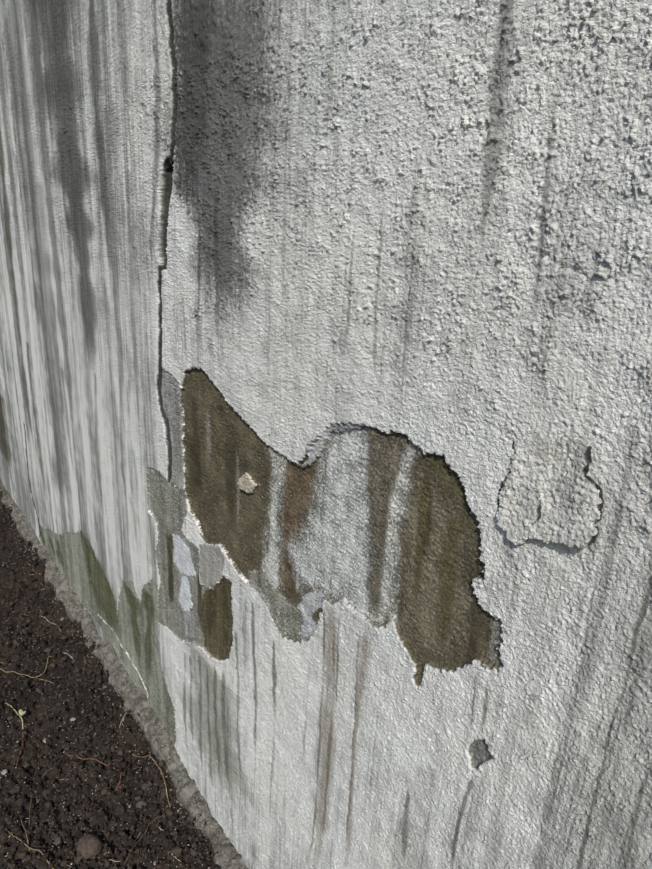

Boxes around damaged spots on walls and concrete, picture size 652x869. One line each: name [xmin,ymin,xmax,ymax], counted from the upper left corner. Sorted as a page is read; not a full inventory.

water stain [0,132,21,343]
water stain [33,0,96,351]
water stain [89,0,110,247]
crack [157,0,178,482]
water stain [161,0,281,321]
water stain [0,397,9,462]
water stain [21,355,31,426]
spalling [39,368,503,745]
spalling [469,739,493,769]